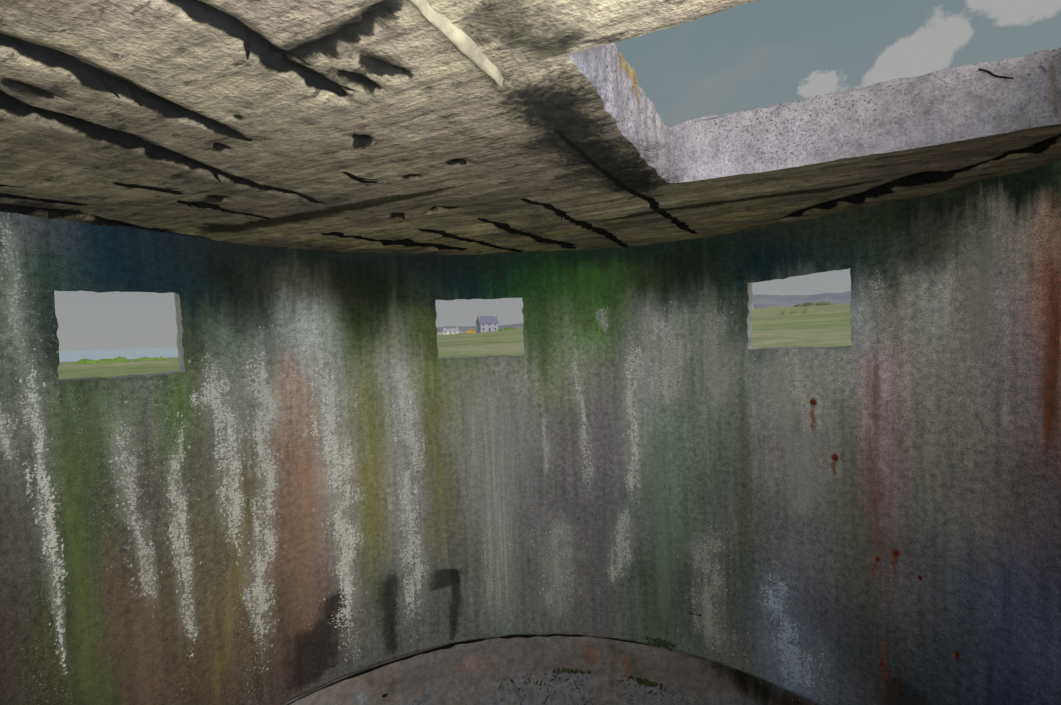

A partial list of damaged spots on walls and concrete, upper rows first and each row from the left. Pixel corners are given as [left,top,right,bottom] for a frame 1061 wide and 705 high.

crack [0,33,253,141]
crack [0,91,323,219]
crack [167,0,356,97]
crack [320,198,629,252]
damp [497,72,677,196]
crack [780,134,1061,219]
corrosion [1044,268,1061,449]
efflorescence [2,313,70,675]
damp [531,302,721,624]